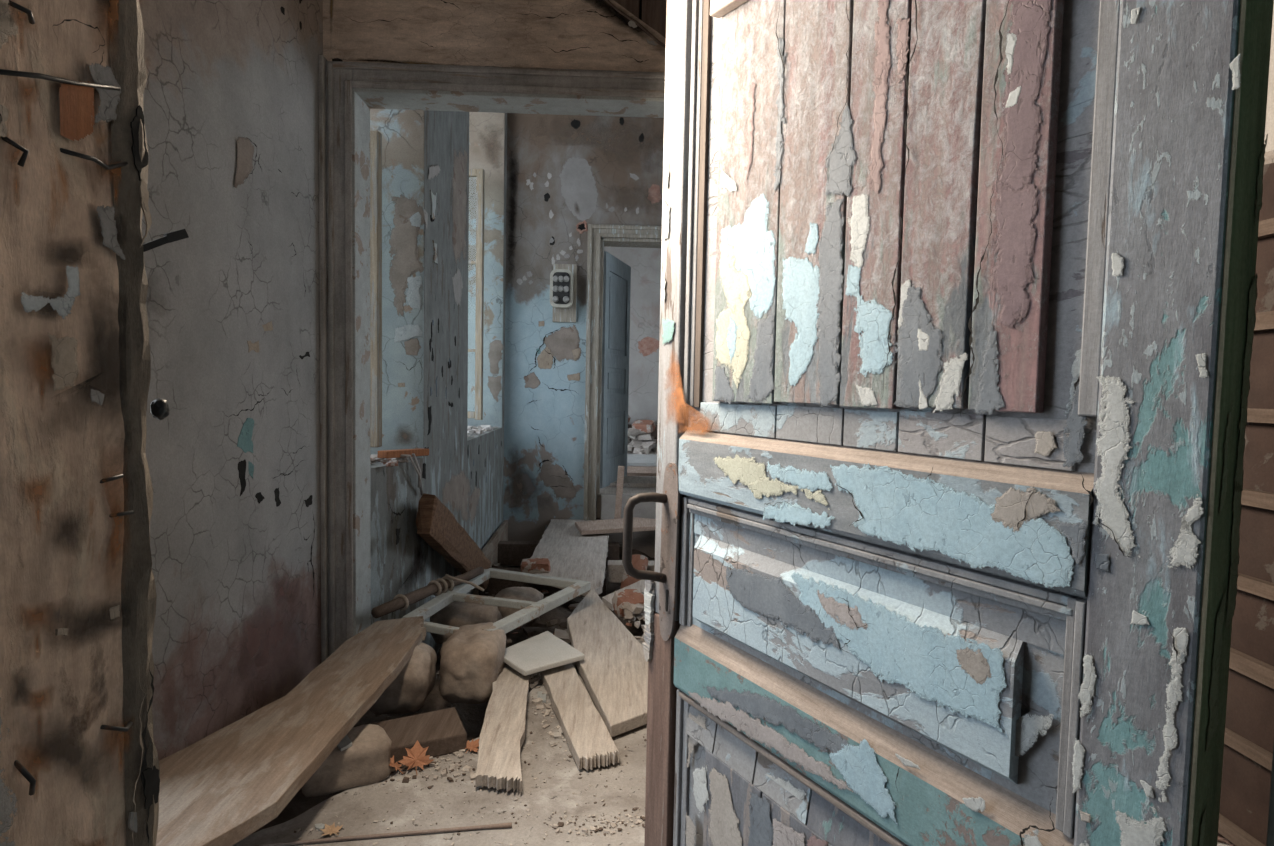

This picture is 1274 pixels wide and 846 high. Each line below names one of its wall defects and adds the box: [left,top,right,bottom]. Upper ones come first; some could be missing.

peeling [1229,53,1241,90]
spalling [389,146,468,479]
spalling [524,321,582,389]
spalling [526,157,670,264]
peeling [714,0,1054,415]
peeling [1111,253,1124,277]
peeling [714,349,1140,593]
peeling [685,685,898,846]
peeling [726,566,1054,757]
peeling [1072,738,1085,794]
peeling [1078,654,1096,718]
peeling [1115,626,1189,846]